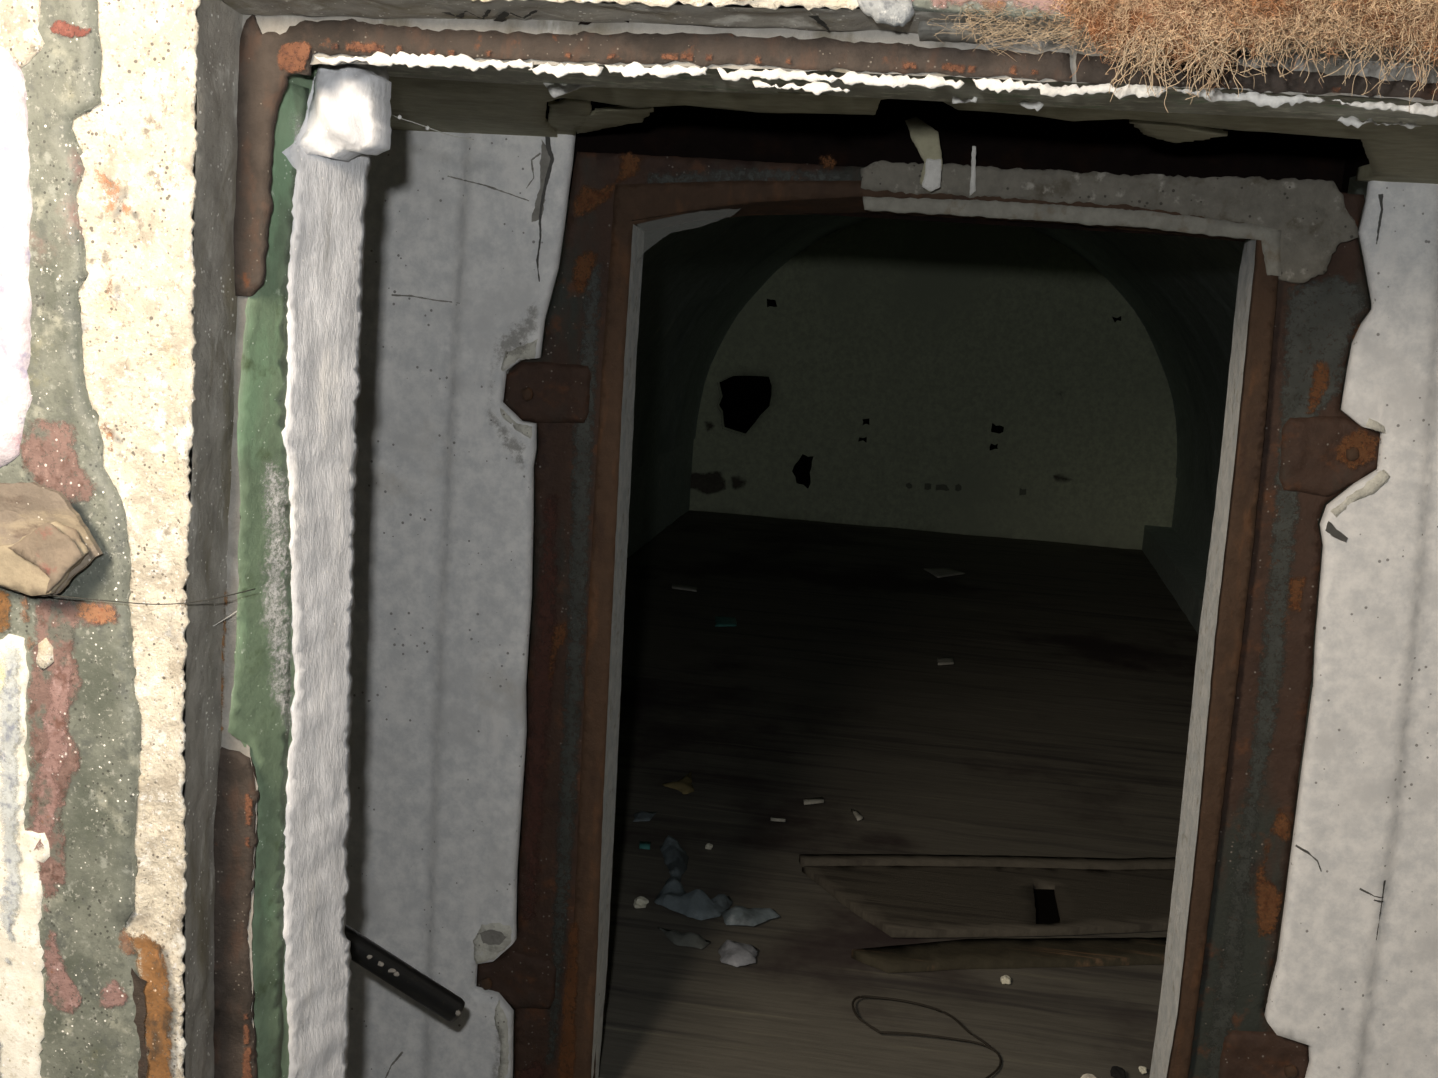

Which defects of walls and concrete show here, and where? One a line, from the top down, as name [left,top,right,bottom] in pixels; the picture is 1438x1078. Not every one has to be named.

spalling [472,0,915,27]
peeling [932,0,1076,14]
spalling [314,51,1438,199]
spalling [801,212,1206,238]
spalling [501,339,538,371]
spalling [717,375,772,436]
corrosion [1336,429,1380,470]
spalling [792,454,813,488]
spalling [0,0,201,1078]
corrosion [1255,809,1290,937]
spalling [473,923,512,964]
corrosion [119,929,173,1078]